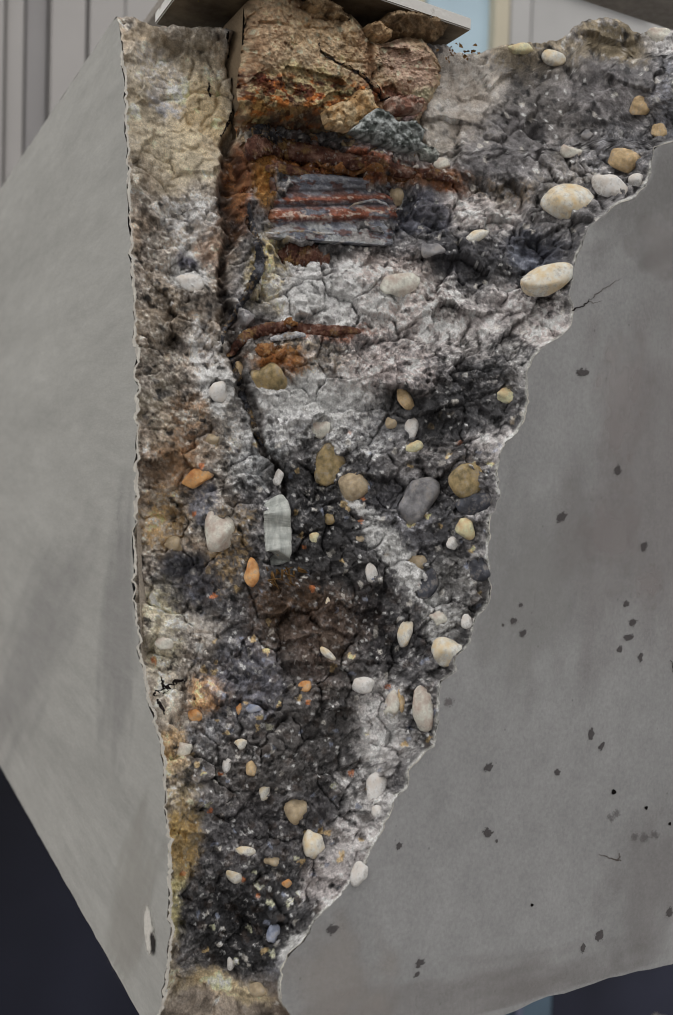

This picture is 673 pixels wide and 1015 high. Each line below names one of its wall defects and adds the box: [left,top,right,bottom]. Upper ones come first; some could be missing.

crack [317,38,390,101]
rust [222,123,459,222]
spalling [433,157,450,170]
rust [277,242,330,268]
spalling [175,273,204,292]
crack [572,281,615,311]
rust [226,317,361,372]
spalling [128,228,141,521]
spalling [209,381,227,402]
spalling [205,434,220,444]
spalling [131,526,175,1015]
spalling [350,861,368,887]